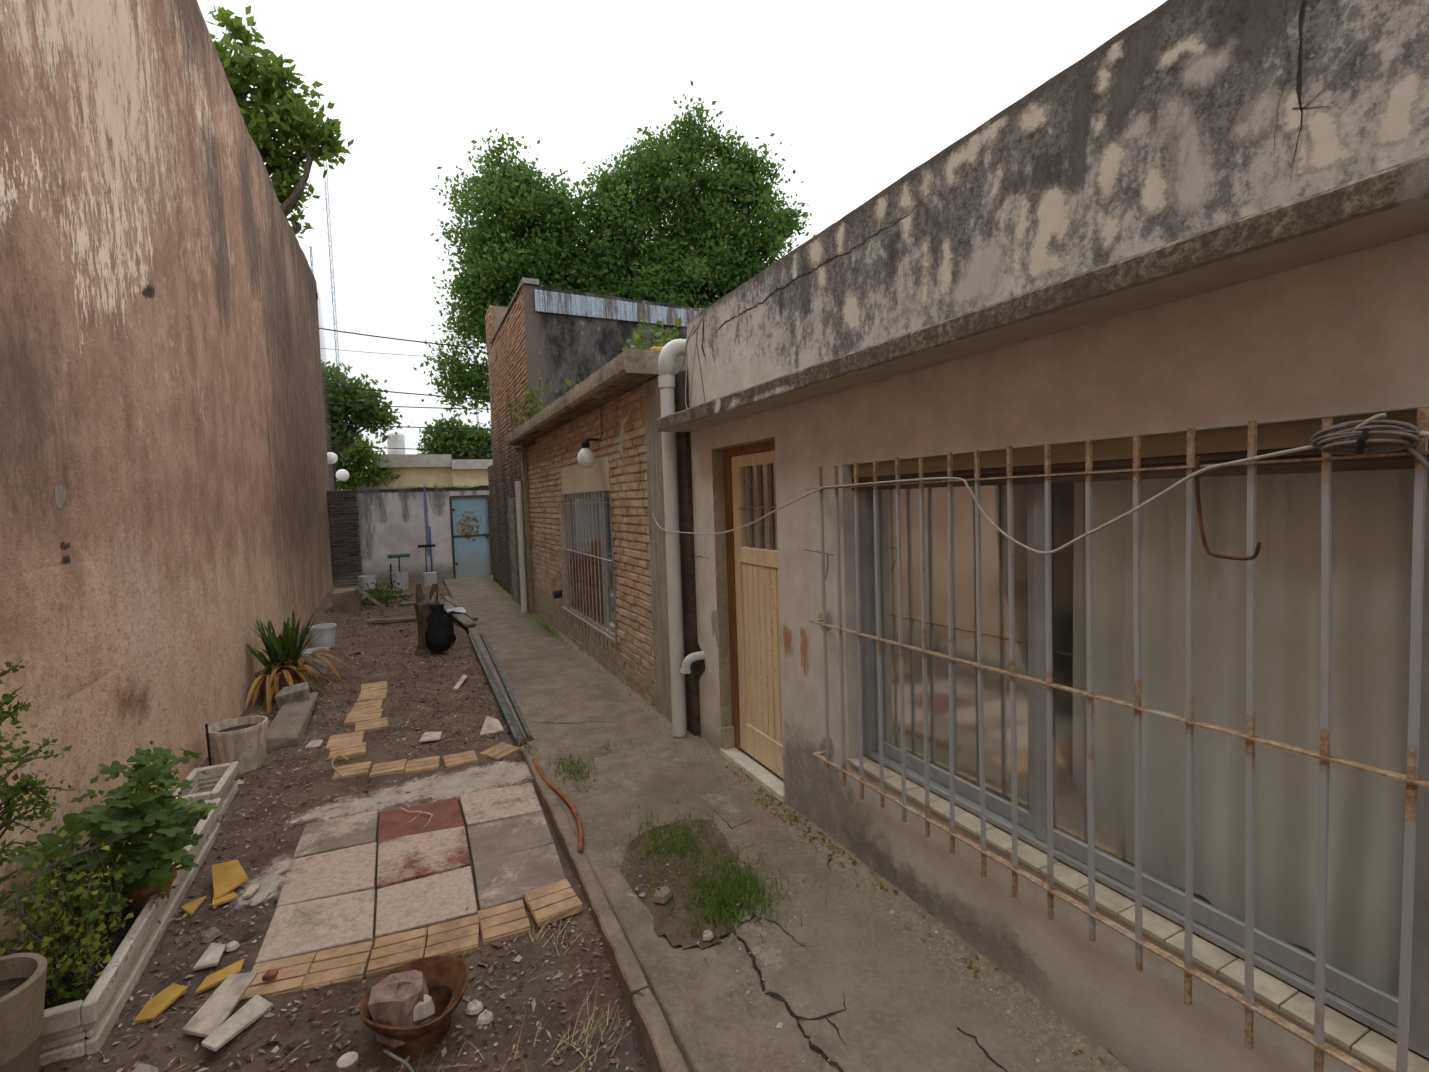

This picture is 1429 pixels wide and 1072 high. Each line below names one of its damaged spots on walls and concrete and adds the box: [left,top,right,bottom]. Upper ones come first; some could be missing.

peeling [0,0,173,352]
peeling [168,0,221,216]
leakage [800,258,811,313]
crack [692,174,967,360]
leakage [887,236,899,278]
leakage [931,209,943,287]
leakage [1007,69,1095,194]
crack [1273,0,1364,180]
crack [731,915,846,1072]
crack [957,1027,1008,1072]